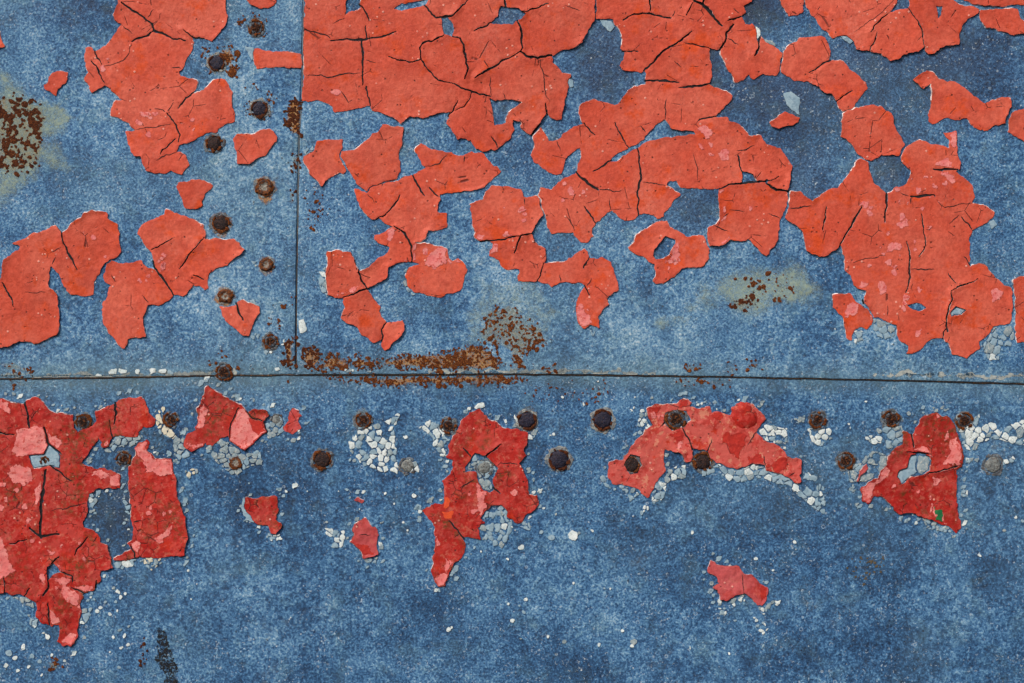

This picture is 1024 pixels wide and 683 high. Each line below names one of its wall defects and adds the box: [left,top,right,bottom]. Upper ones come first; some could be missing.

corrosion [0,92,45,177]
peeling [0,0,277,349]
corrosion [200,44,303,138]
corrosion [237,12,267,38]
corrosion [262,296,613,431]
crack [0,0,1024,440]
peeling [245,0,1024,360]
corrosion [728,271,794,312]
crack [0,402,97,625]
peeling [0,376,310,676]
peeling [402,402,557,592]
peeling [848,406,1024,538]